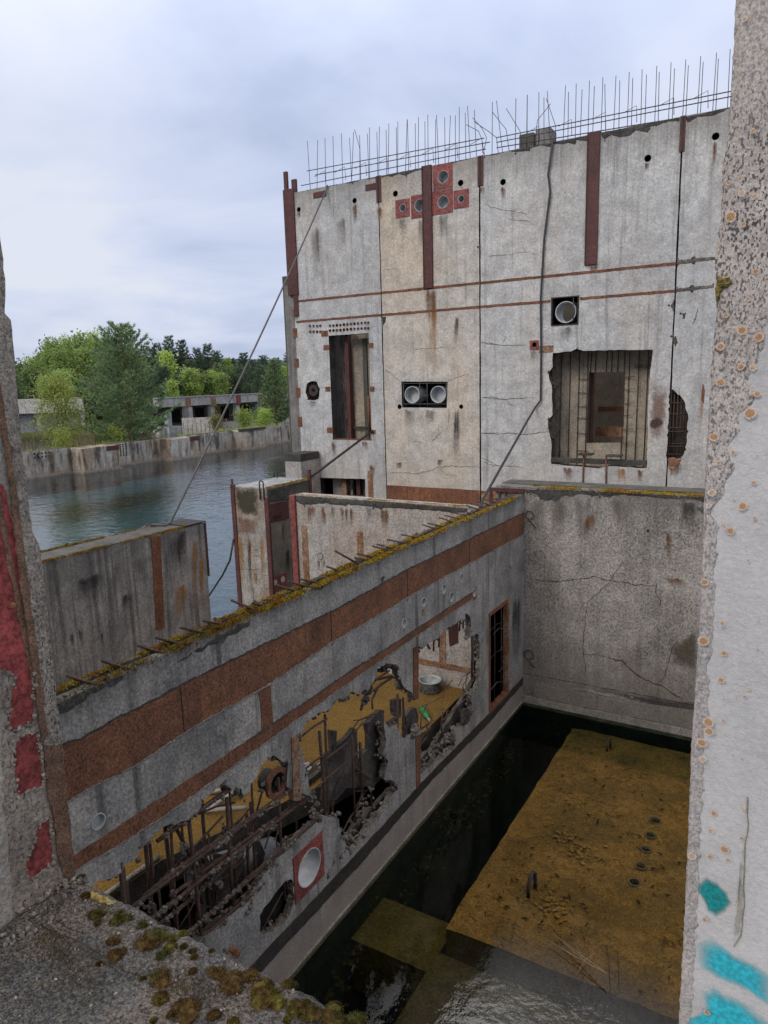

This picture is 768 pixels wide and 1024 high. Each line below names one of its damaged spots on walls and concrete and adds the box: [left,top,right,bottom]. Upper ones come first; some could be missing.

rust [426,291,436,333]
spalling [0,578,484,948]
spalling [62,513,524,803]
spalling [268,0,768,1024]
crack [536,563,683,700]